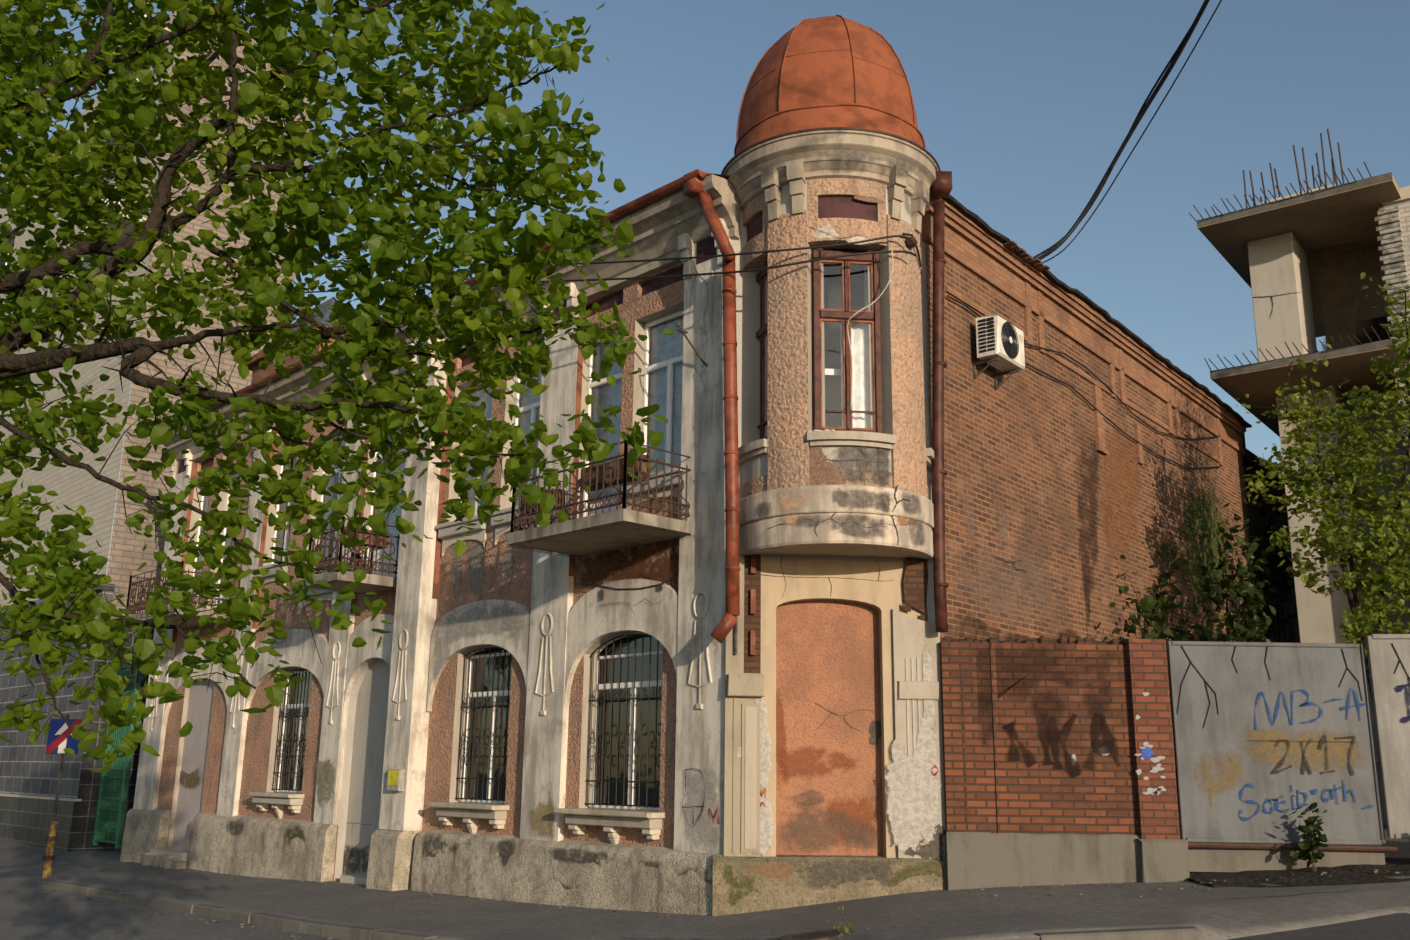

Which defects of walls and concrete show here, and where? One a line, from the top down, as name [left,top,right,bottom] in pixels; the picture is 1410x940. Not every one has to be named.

leakage [756,502,769,517]
crack [761,459,910,597]
leakage [798,446,925,545]
leakage [1078,451,1098,622]
peeling [746,697,793,881]
peeling [869,700,946,860]
leakage [424,836,459,857]
leakage [498,840,515,866]
leakage [553,848,607,865]
leakage [786,791,897,889]